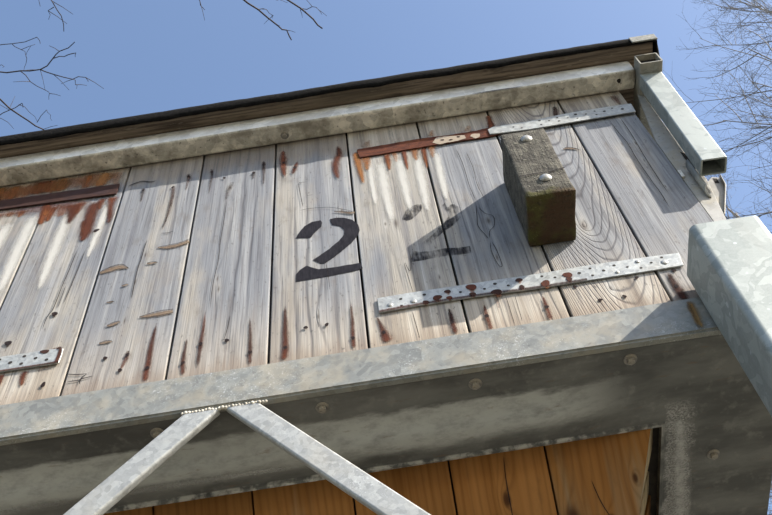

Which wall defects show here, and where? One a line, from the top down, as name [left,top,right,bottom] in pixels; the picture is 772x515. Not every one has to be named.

corrosion [0,173,120,200]
corrosion [354,152,370,182]
corrosion [385,147,433,169]
corrosion [35,197,117,240]
corrosion [377,272,587,341]
corrosion [668,273,703,327]
corrosion [143,326,156,380]
corrosion [197,316,205,363]